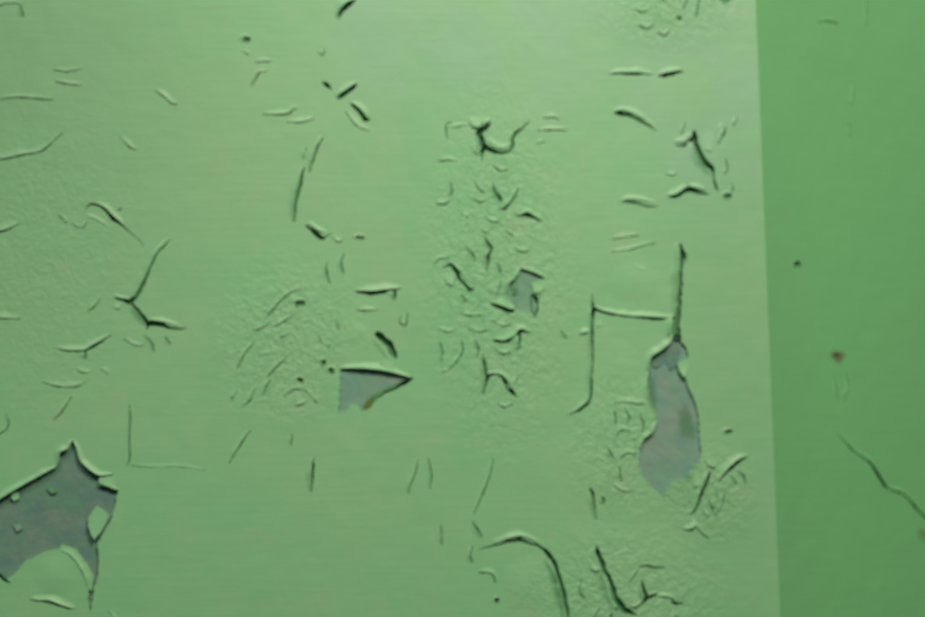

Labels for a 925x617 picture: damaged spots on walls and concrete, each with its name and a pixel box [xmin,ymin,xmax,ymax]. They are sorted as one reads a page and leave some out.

crack [322,81,371,122]
crack [445,116,567,162]
crack [612,105,718,208]
crack [84,201,187,330]
crack [443,236,531,398]
peeling [502,266,546,317]
crack [568,242,687,415]
peeling [318,356,413,414]
peeling [638,333,701,506]
peeling [0,439,118,611]
crack [478,529,570,617]
crack [589,546,683,617]